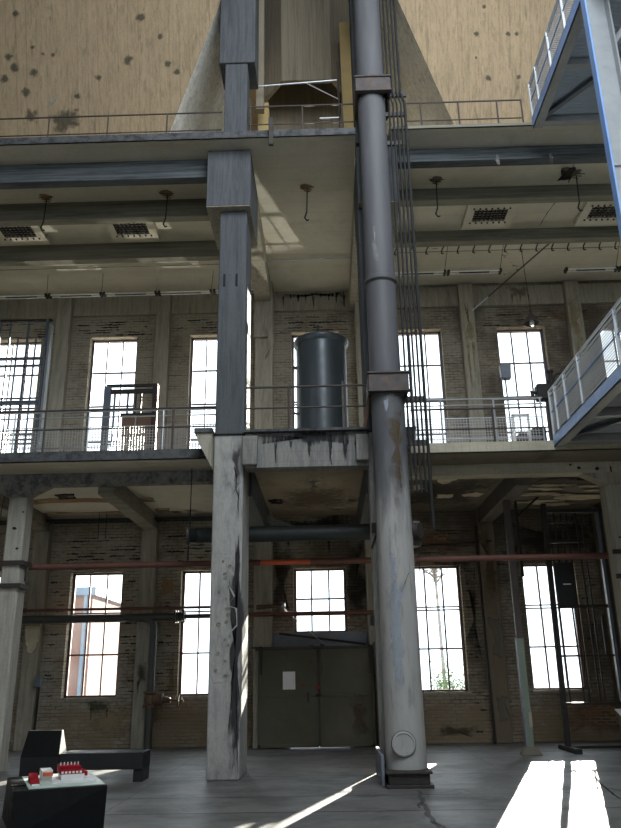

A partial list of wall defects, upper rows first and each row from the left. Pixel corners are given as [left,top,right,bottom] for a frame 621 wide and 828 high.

water stain [54,110,79,132]
water stain [282,291,345,306]
water stain [264,432,356,462]
peeling [512,478,601,506]
crack [417,790,446,828]